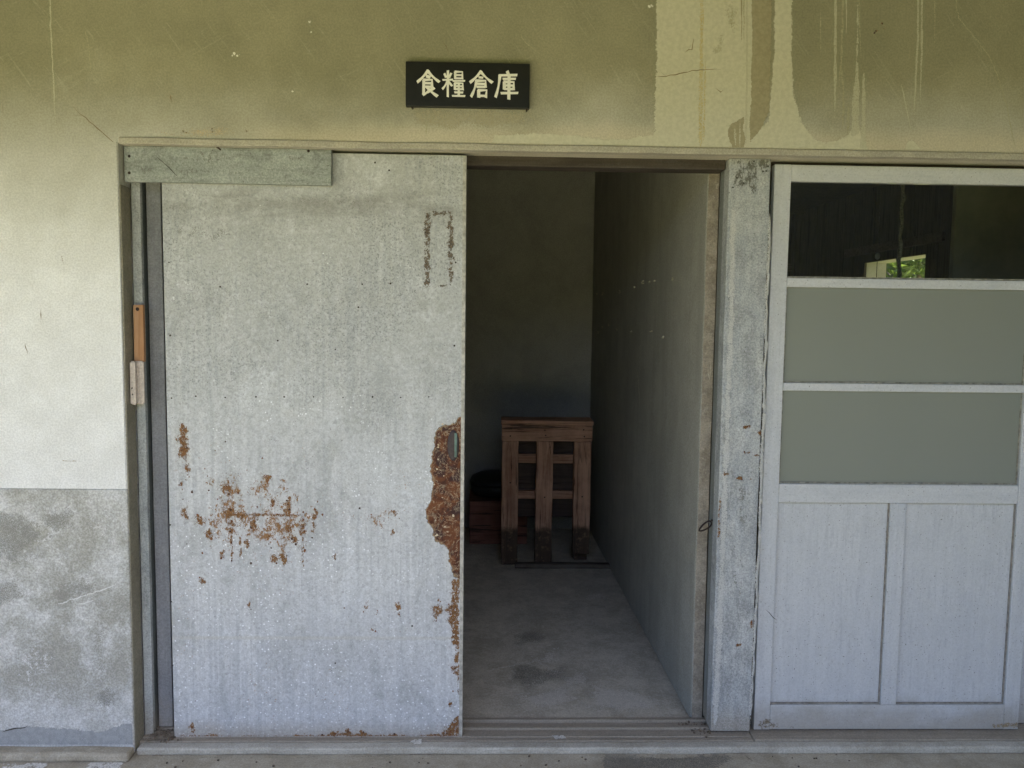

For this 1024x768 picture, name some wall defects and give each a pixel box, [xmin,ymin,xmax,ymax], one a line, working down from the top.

crack [659,39,722,92]
water stain [713,0,772,147]
efflorescence [833,0,867,148]
water stain [914,0,935,117]
rust [175,423,323,567]
rust [421,417,461,737]
rust [287,728,404,738]